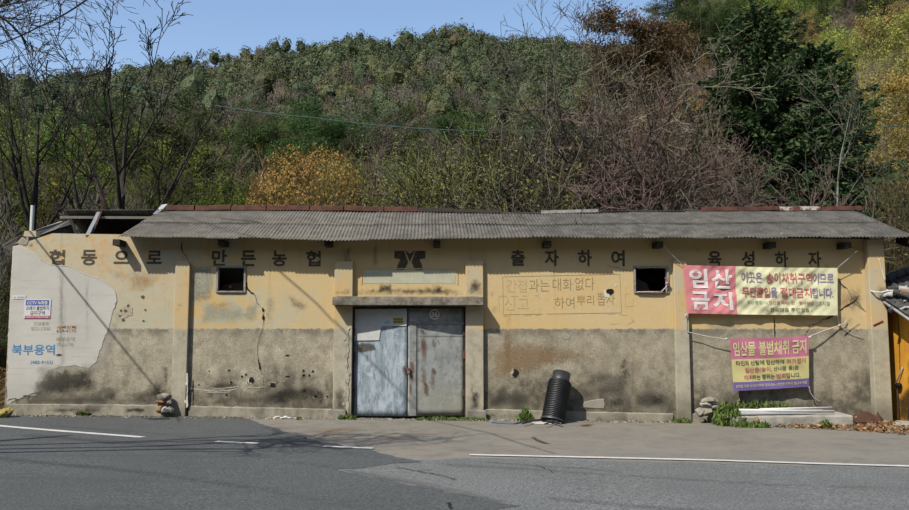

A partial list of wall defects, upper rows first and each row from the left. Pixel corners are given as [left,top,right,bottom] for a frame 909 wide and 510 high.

spalling [119,304,133,321]
crack [246,282,265,375]
leakage [38,370,91,411]